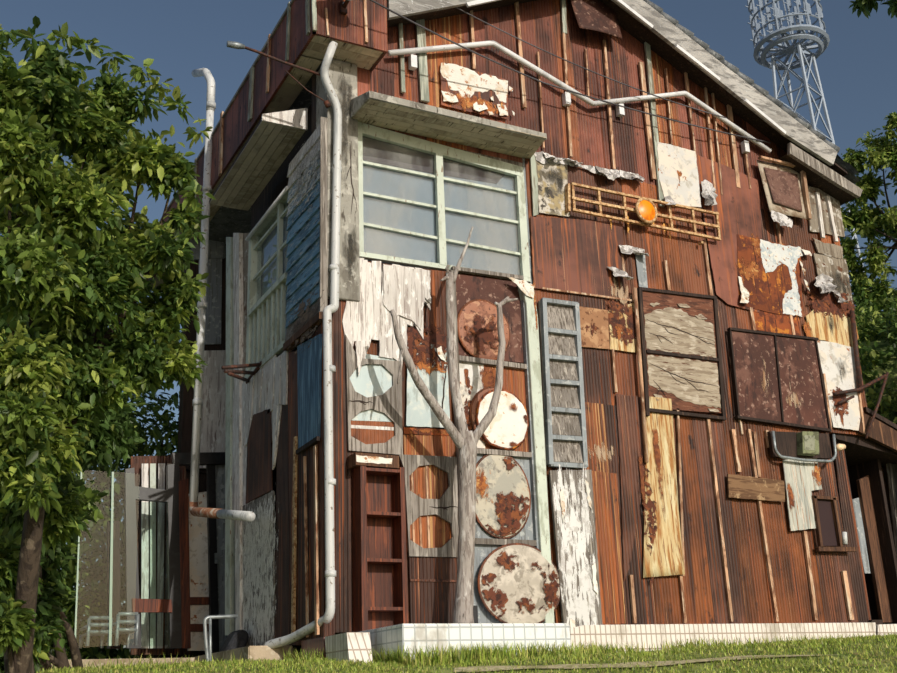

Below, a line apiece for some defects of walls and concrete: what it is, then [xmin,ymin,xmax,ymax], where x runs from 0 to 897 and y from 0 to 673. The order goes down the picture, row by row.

peeling [440,63,515,116]
rust [357,0,864,625]
crack [647,319,714,345]
peeling [738,276,749,303]
peeling [760,239,812,317]
crack [650,363,715,398]
peeling [242,482,279,646]
peeling [553,462,599,628]